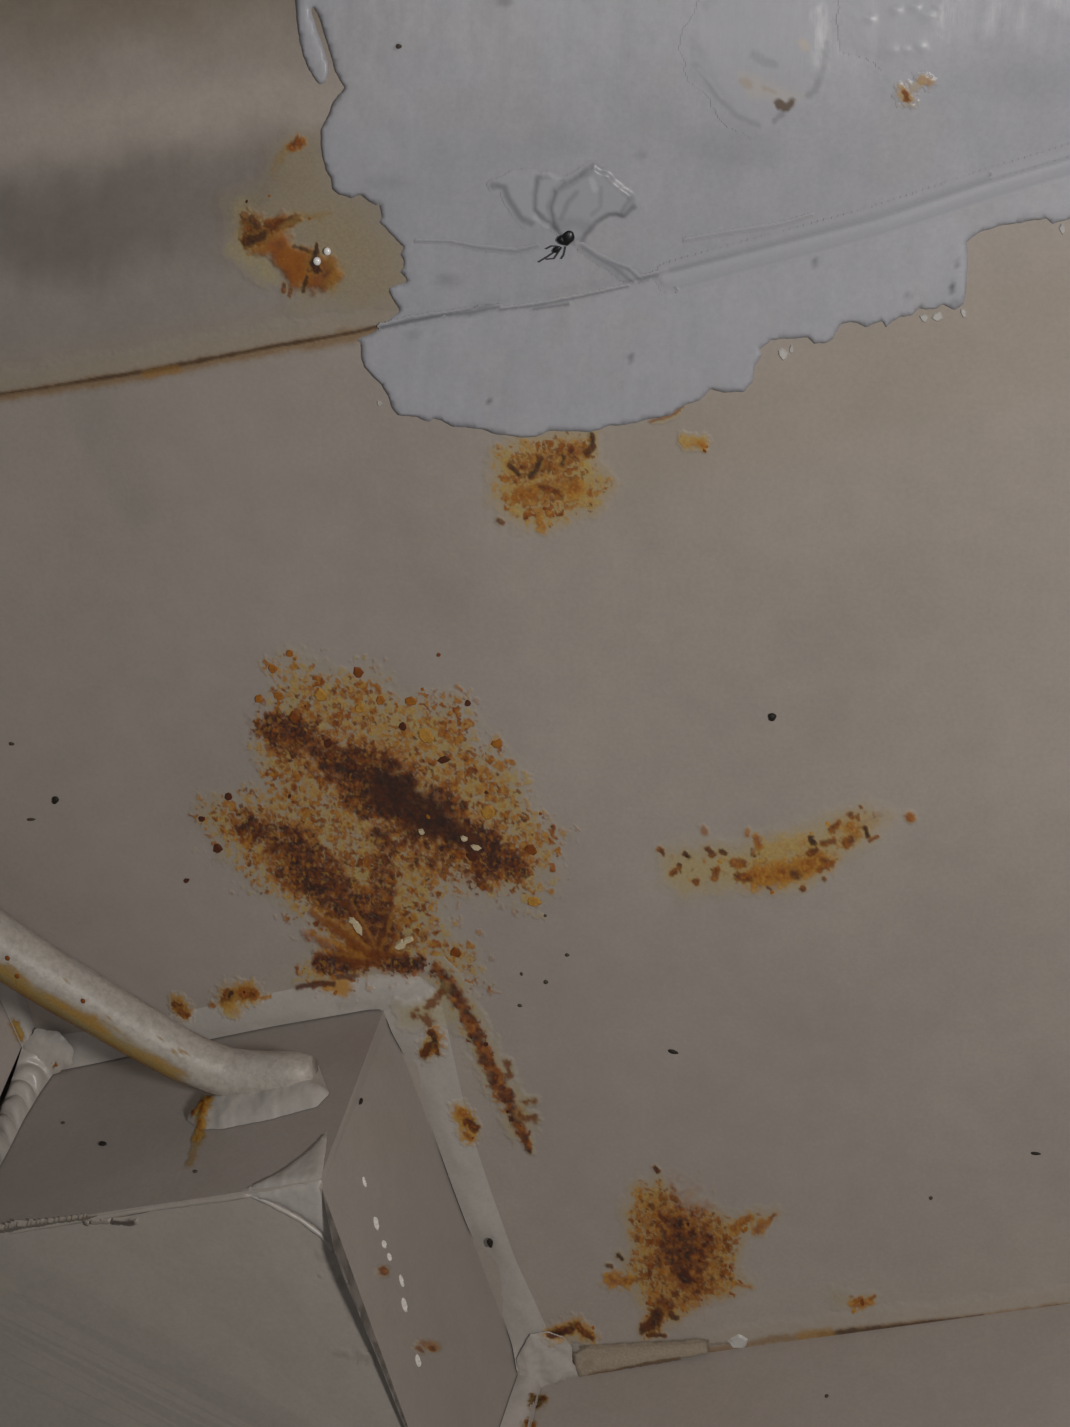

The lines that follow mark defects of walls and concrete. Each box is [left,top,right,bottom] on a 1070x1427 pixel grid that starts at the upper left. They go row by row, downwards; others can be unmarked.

corrosion [0,124,407,413]
corrosion [480,426,626,544]
corrosion [163,634,581,1157]
corrosion [646,789,920,908]
corrosion [595,1159,1070,1353]